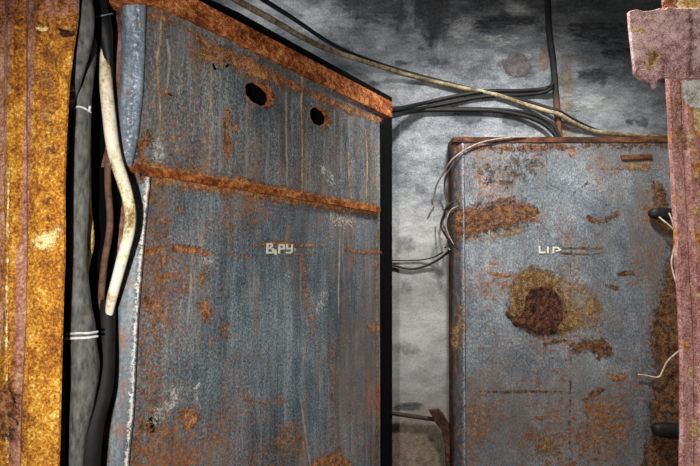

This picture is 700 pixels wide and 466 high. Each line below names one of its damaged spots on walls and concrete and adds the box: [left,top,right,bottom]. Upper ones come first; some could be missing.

water stain [475,0,545,47]
water stain [559,0,662,59]
corrosion [147,8,383,124]
water stain [578,68,615,87]
corrosion [119,129,382,466]